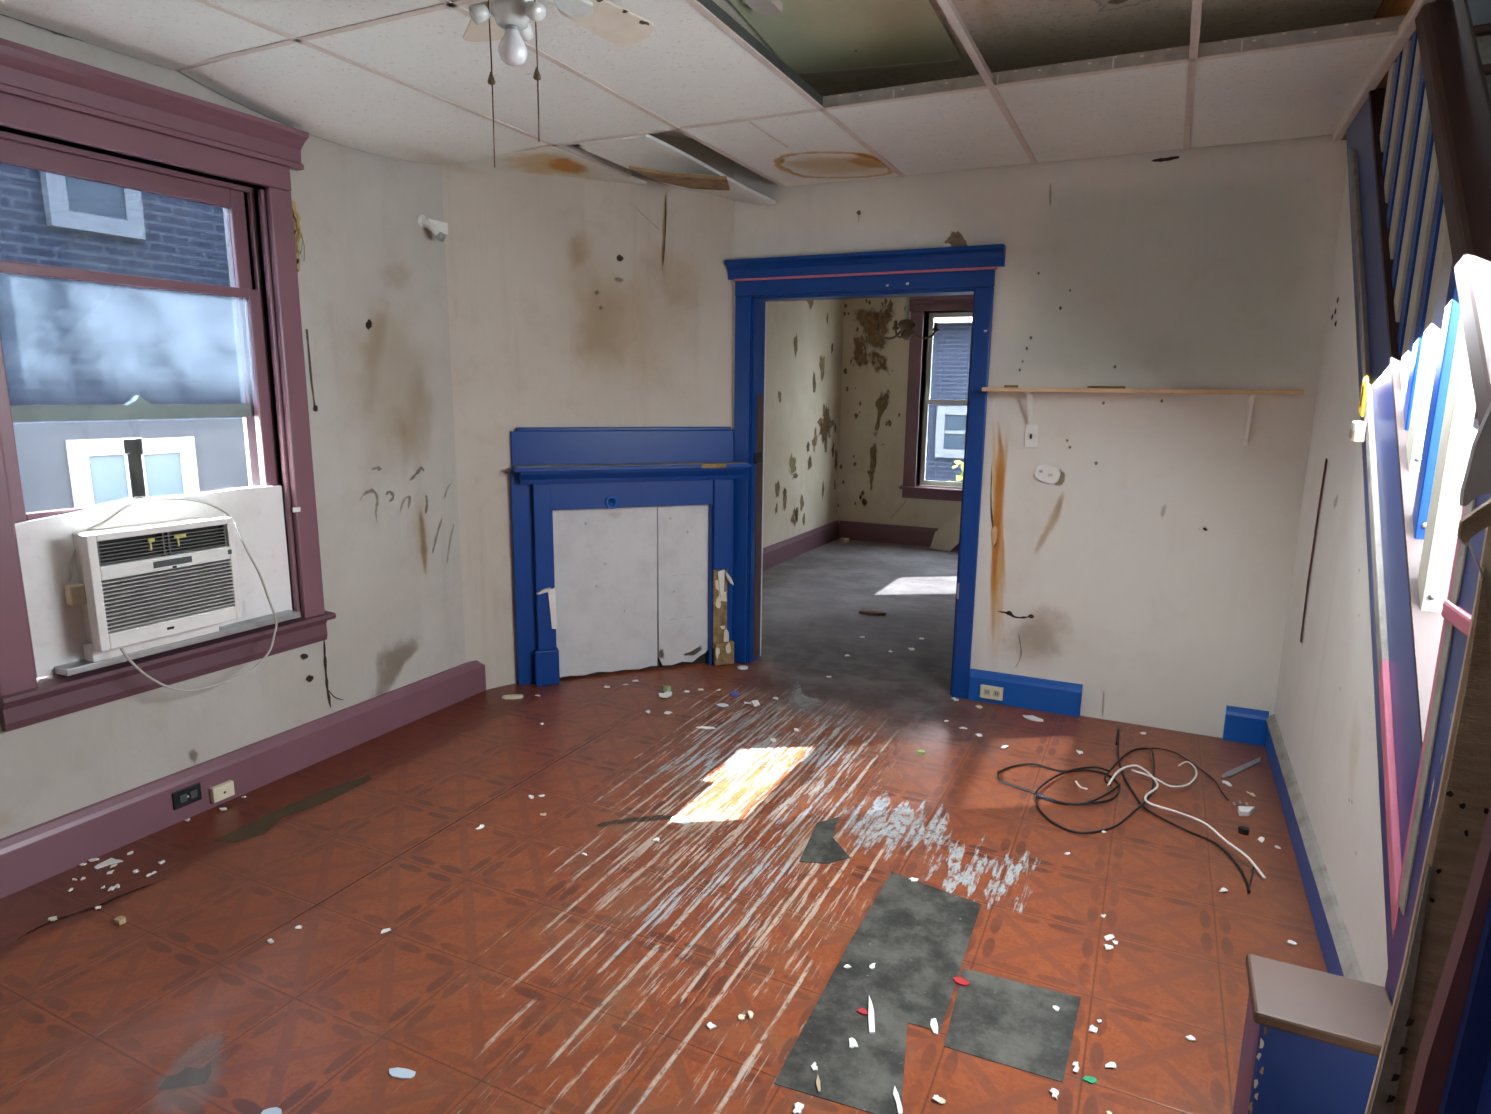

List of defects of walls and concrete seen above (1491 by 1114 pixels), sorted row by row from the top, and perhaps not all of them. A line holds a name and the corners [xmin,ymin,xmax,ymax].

peeling [775,343,838,525]
peeling [799,817,850,864]
peeling [774,872,1081,1114]